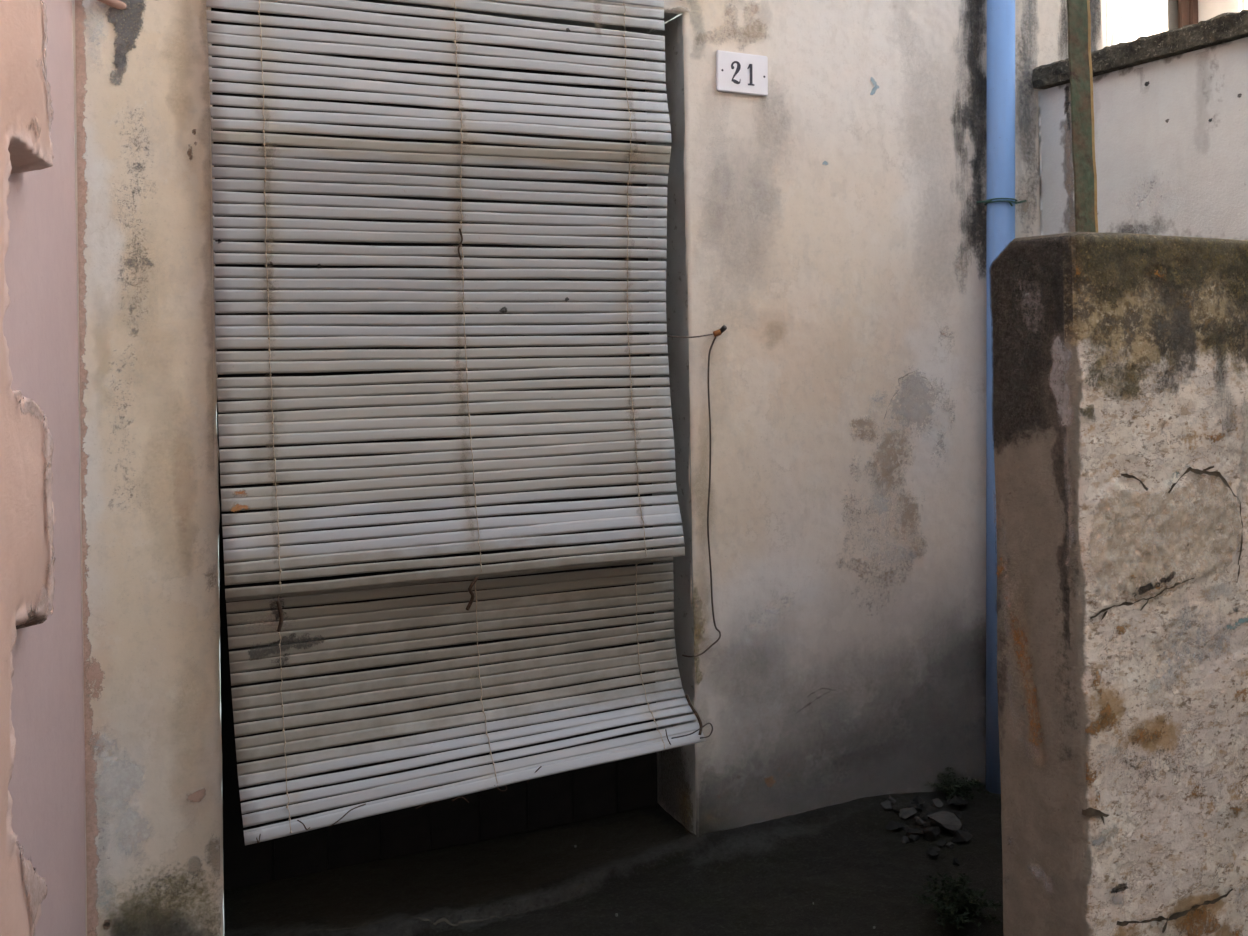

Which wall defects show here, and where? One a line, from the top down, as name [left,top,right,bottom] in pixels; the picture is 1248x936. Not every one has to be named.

water stain [110,46,128,85]
water stain [952,0,987,247]
water stain [1020,0,1037,142]
water stain [118,226,154,334]
water stain [989,86,1076,444]
water stain [1086,361,1107,387]
spalling [12,389,56,630]
crack [1121,466,1243,582]
crack [1090,578,1194,620]
crack [1116,888,1233,933]